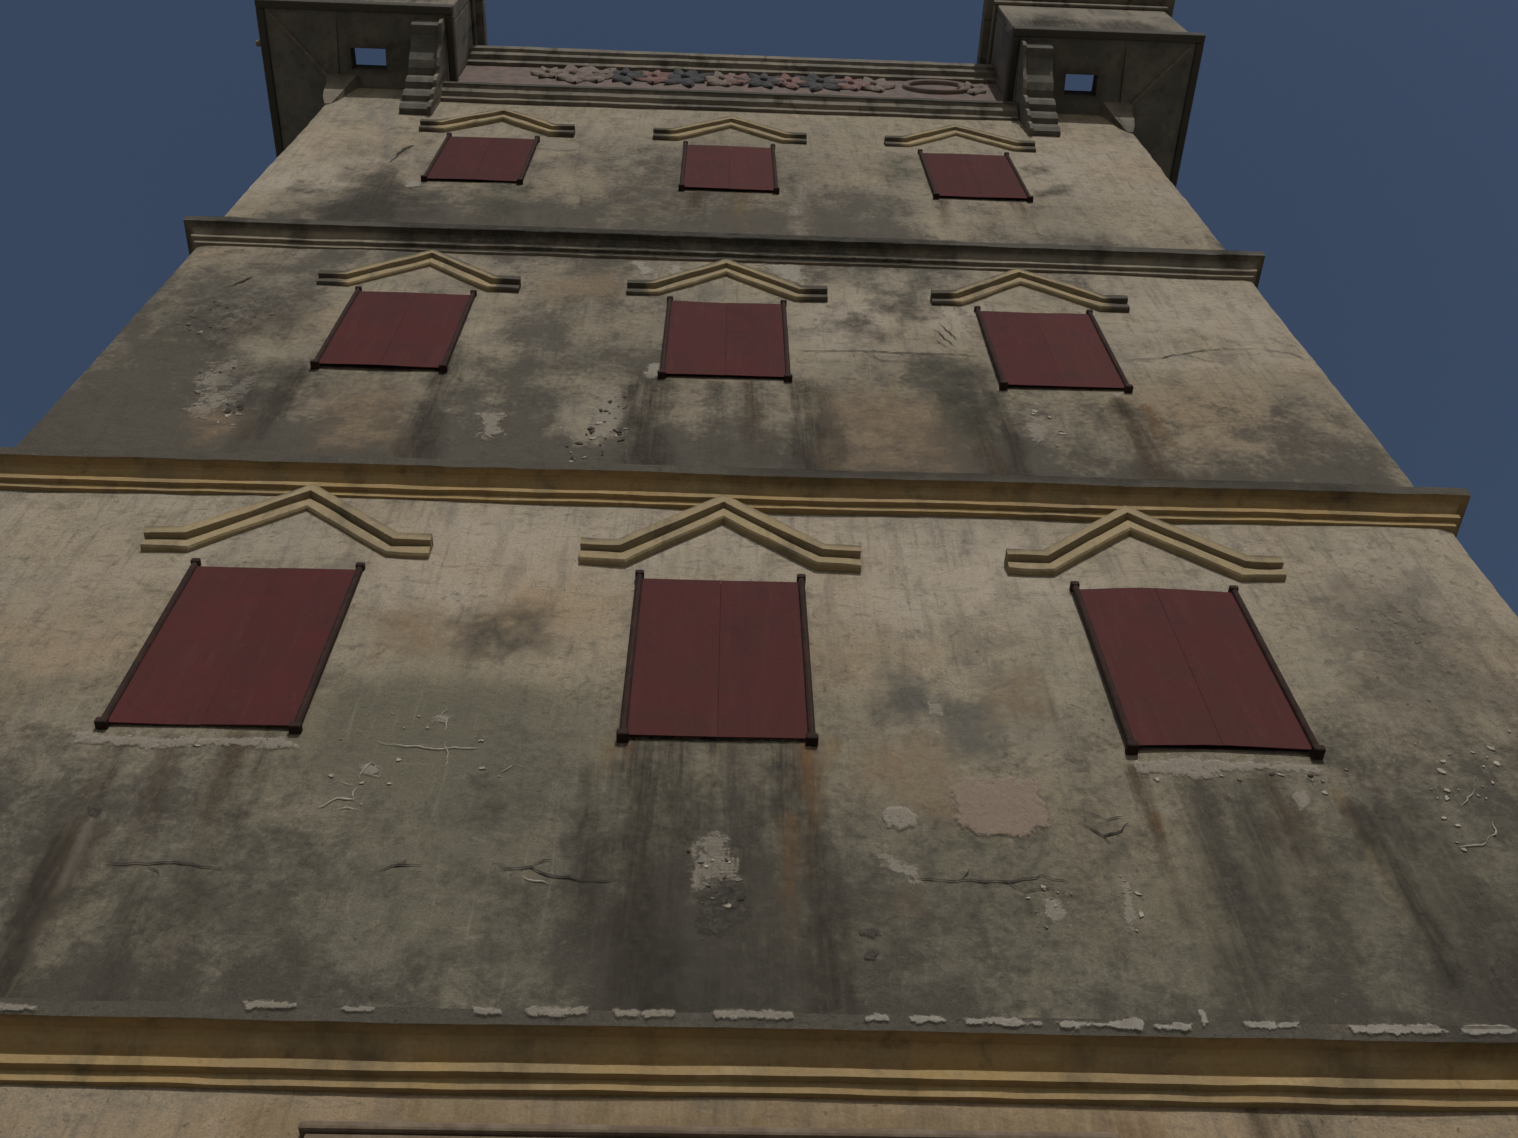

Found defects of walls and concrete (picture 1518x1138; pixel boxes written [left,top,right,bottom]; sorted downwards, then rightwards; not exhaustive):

water stain [538,139,581,151]
water stain [400,222,928,283]
water stain [613,740,675,1012]
flaking render [687,831,751,935]
peeling [244,1000,297,1010]
peeling [526,1006,588,1017]
peeling [614,1008,675,1018]
peeling [714,1009,793,1020]
peeling [909,1015,946,1024]
peeling [967,1009,1209,1030]
peeling [1243,1020,1299,1029]
peeling [1349,1023,1517,1035]